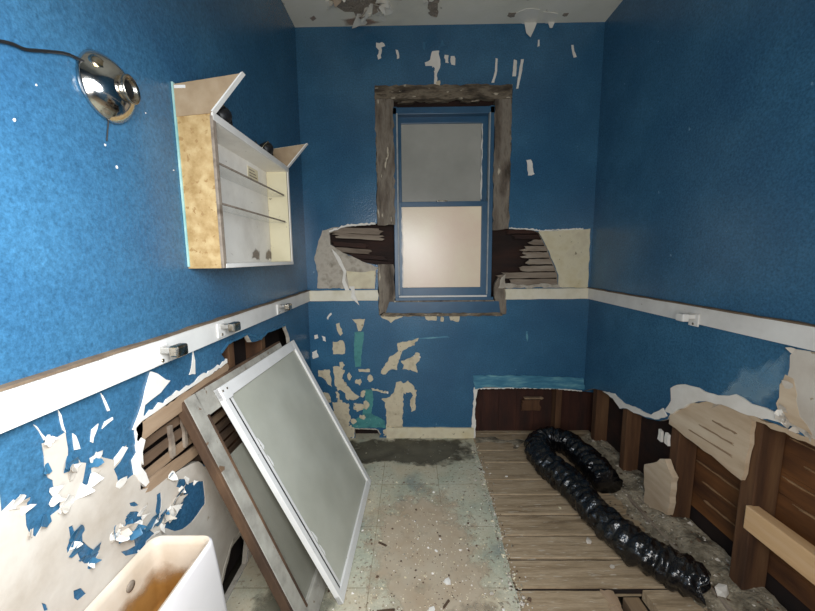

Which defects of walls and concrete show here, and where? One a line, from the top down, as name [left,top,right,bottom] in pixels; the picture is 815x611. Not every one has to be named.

flaking render [327,0,393,29]
peeling [425,51,455,85]
peeling [512,59,524,89]
spalling [314,207,404,305]
spalling [491,227,590,291]
peeling [314,313,421,438]
peeling [0,324,286,611]
spalling [471,347,815,611]